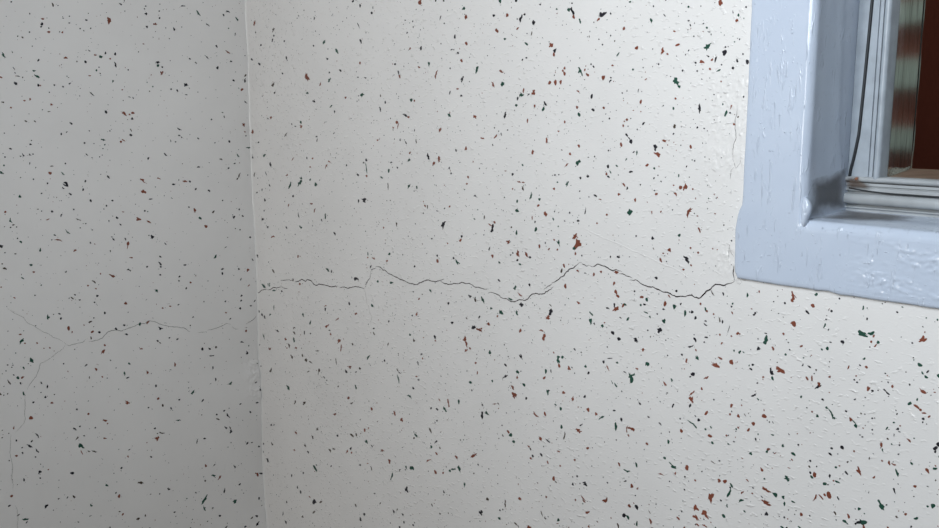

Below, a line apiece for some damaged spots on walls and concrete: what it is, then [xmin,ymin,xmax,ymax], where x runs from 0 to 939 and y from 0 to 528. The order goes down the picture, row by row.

crack [258,246,734,320]